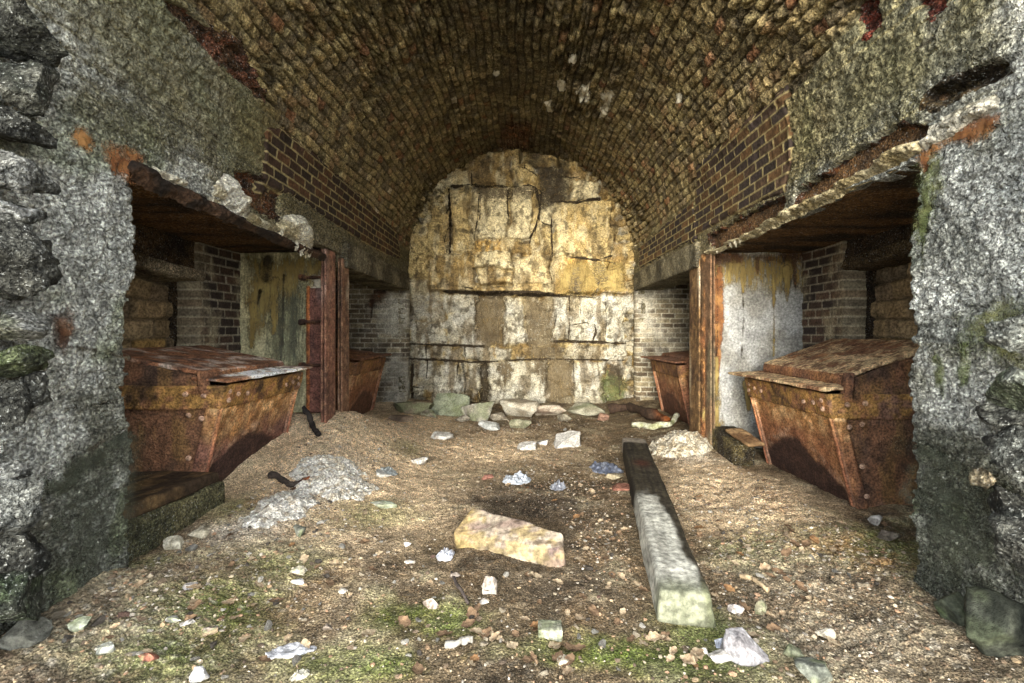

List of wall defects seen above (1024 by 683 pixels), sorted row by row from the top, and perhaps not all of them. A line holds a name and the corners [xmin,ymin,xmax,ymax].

efflorescence [544,79,615,118]
corrosion [73,127,327,261]
crack [444,163,613,263]
flaking render [638,60,1013,268]
water stain [247,255,297,360]
corrosion [700,252,803,381]